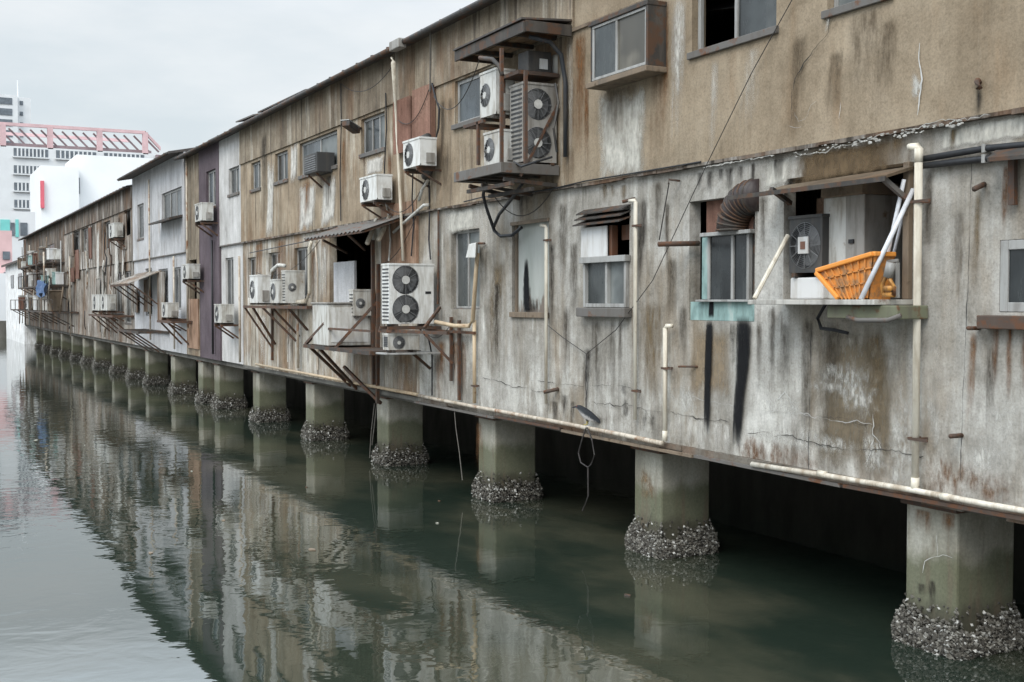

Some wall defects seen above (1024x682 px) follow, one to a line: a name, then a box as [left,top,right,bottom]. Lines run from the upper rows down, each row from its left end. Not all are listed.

spalling [795,114,988,157]
crack [913,43,923,115]
rust [968,164,979,279]
crack [484,350,923,466]
leakage [675,299,786,443]
leakage [803,323,911,482]
rust [940,438,963,489]
rust [962,293,975,413]
rust [995,329,1011,370]